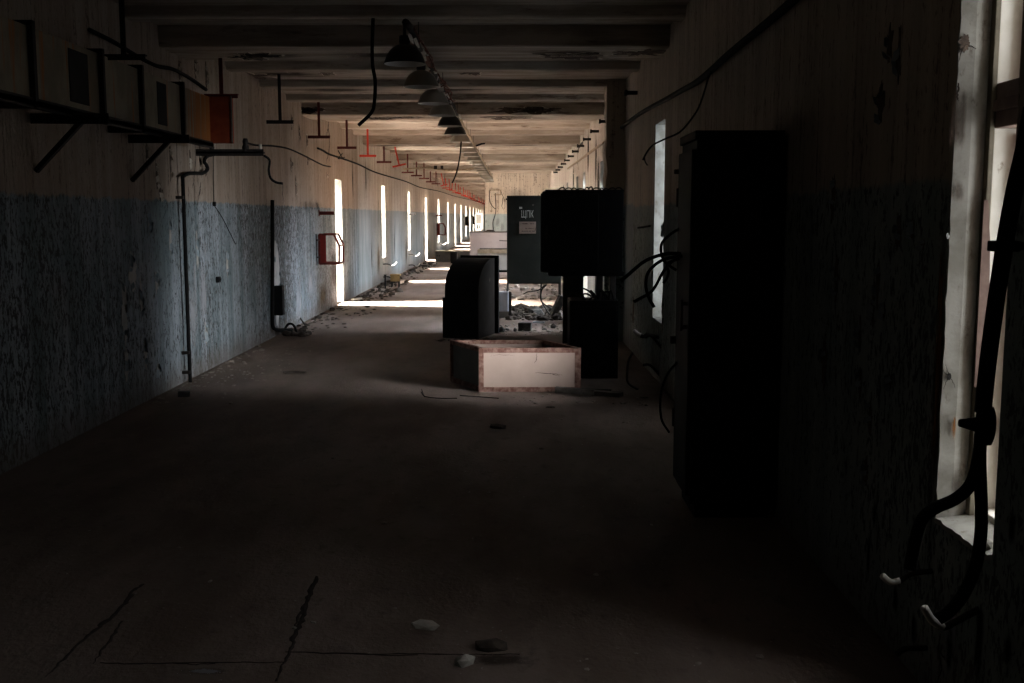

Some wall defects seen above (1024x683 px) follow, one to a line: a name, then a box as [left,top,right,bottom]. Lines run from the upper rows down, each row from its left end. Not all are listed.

crack [45,576,520,682]